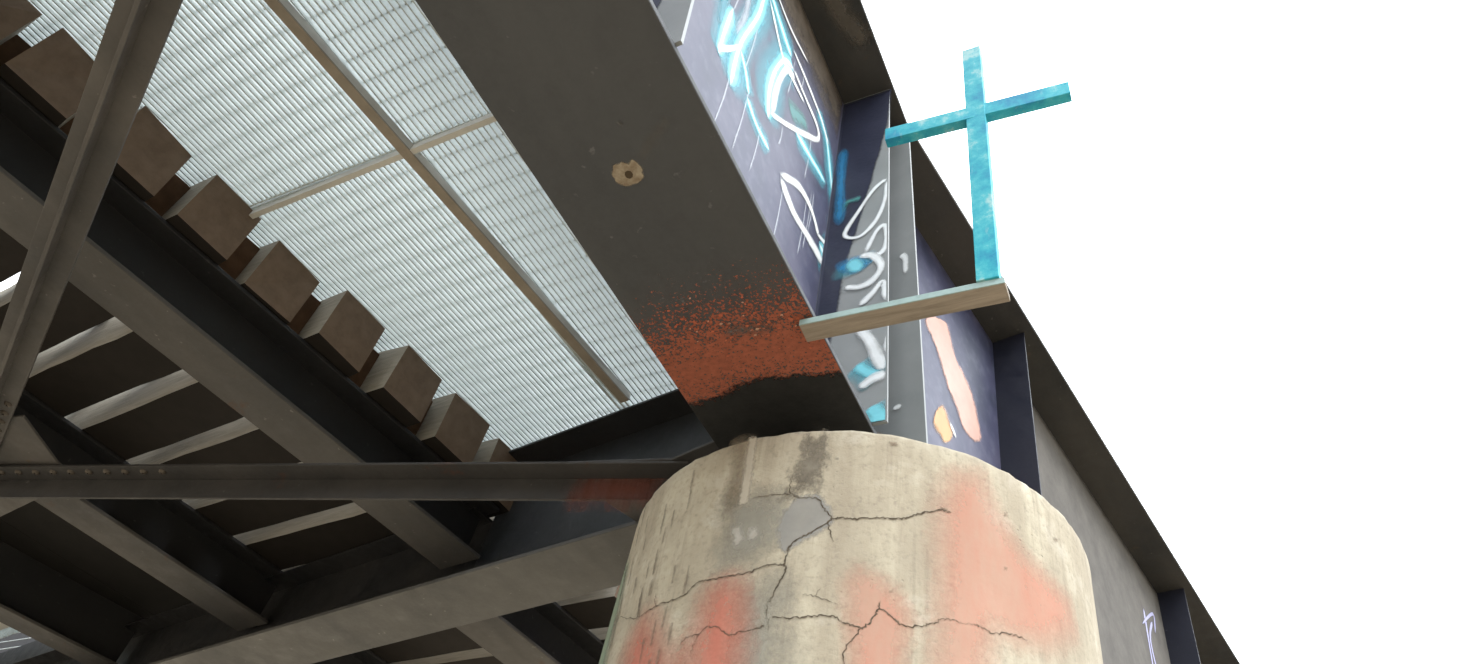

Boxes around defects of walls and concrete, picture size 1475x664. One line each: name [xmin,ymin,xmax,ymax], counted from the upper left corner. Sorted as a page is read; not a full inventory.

crack [621,477,1027,664]